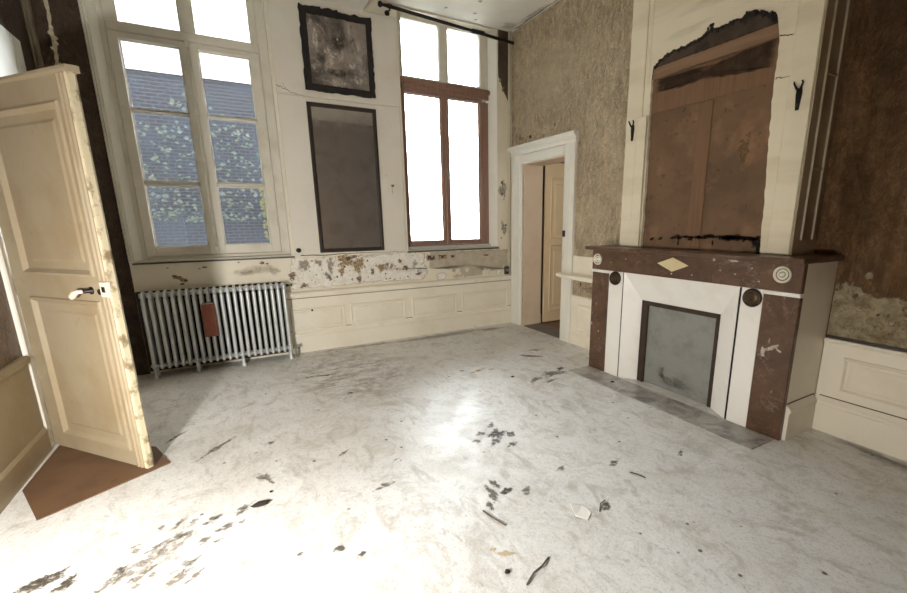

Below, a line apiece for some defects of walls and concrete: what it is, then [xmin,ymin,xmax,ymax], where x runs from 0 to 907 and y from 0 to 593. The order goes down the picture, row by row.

peeling [288,220,508,290]